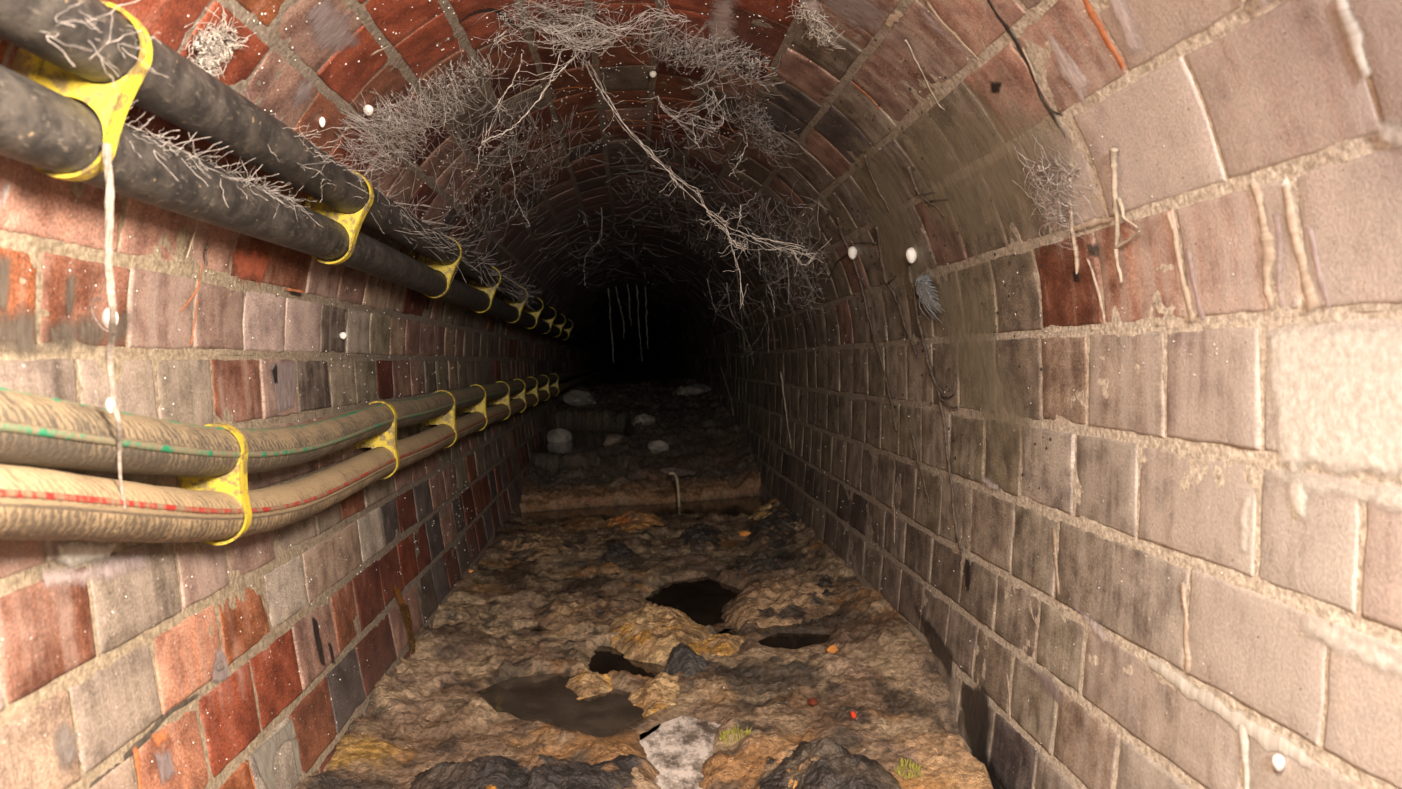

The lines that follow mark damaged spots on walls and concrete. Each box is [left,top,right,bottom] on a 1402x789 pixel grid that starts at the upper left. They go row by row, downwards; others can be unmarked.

damp [1149,583,1311,789]